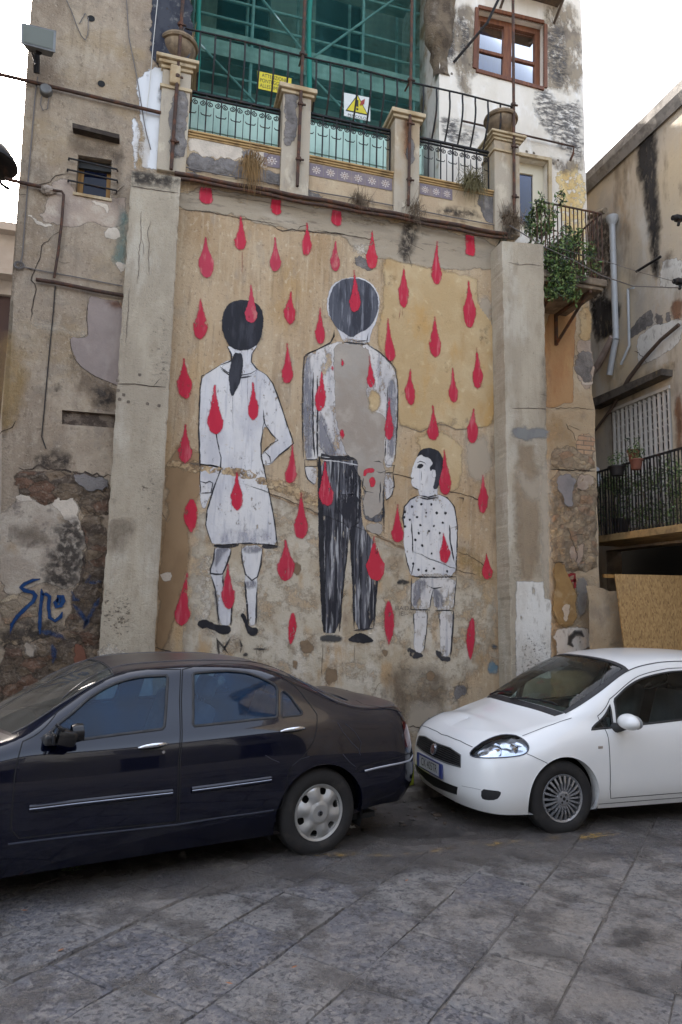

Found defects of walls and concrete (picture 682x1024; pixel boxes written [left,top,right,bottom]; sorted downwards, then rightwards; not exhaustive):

peeling [132,119,140,167]
crack [115,186,421,337]
damp [552,144,581,172]
flaking render [555,164,587,262]
damp [636,131,661,276]
flaking render [630,310,682,365]
spalling [548,434,598,572]
spalling [0,470,130,702]